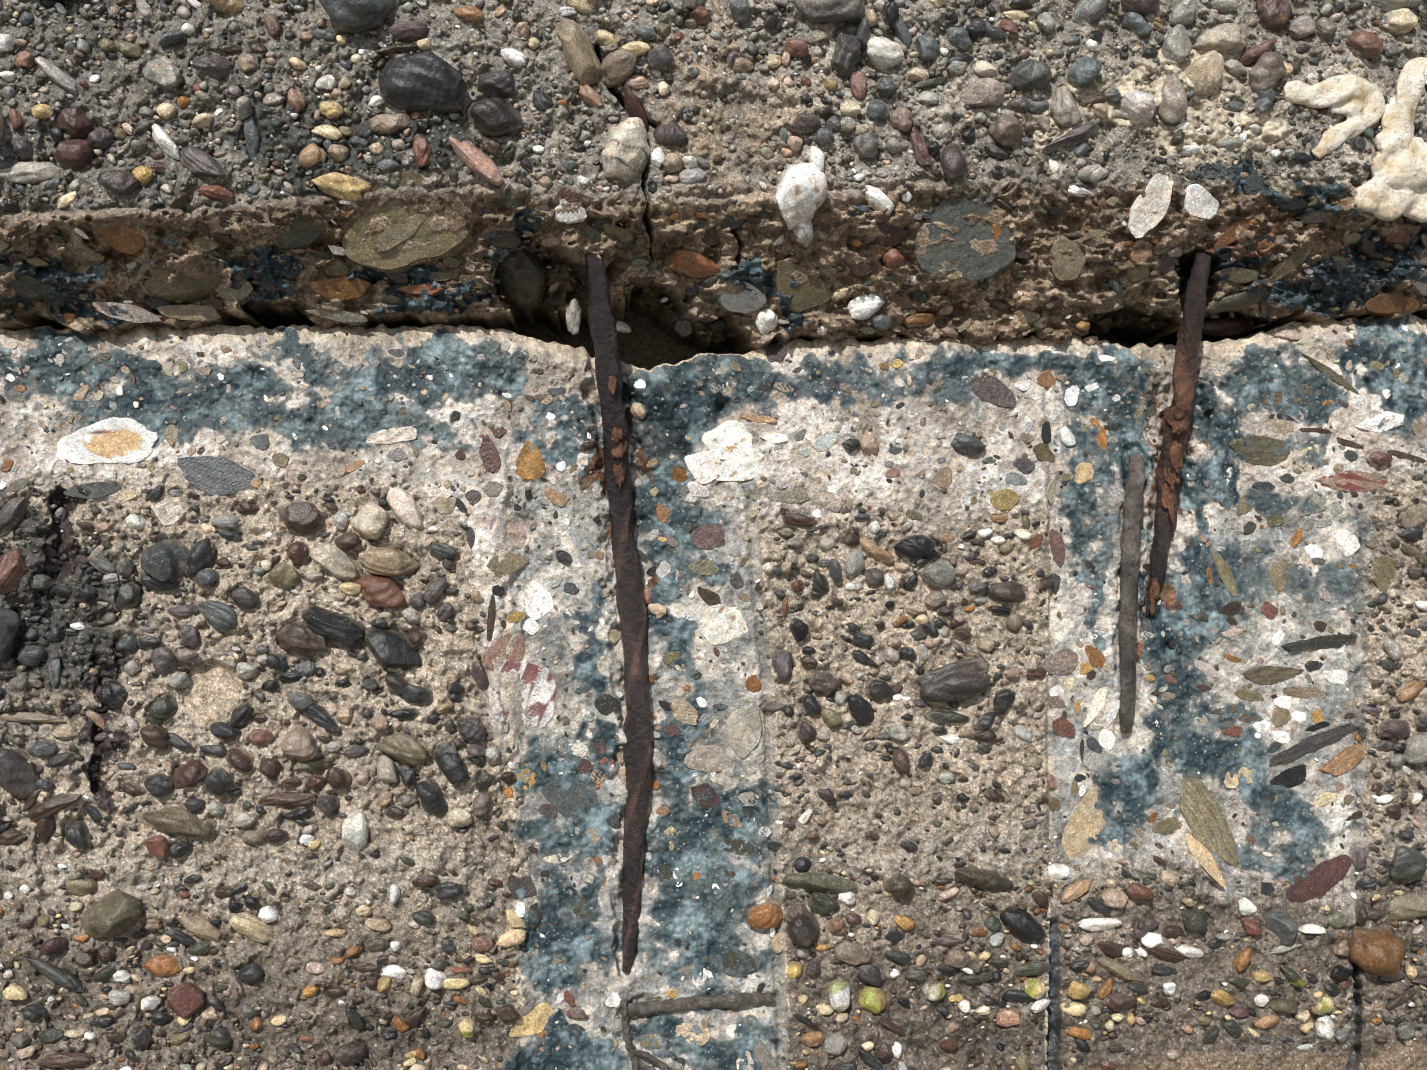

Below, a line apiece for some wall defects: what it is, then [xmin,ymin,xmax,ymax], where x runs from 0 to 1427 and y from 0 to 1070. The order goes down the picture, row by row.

corrosion [582,367,627,406]
corrosion [580,419,653,499]
corrosion [1142,390,1208,527]
corrosion [647,562,659,590]
leakage [502,48,1427,1070]
corrosion [1136,576,1176,661]